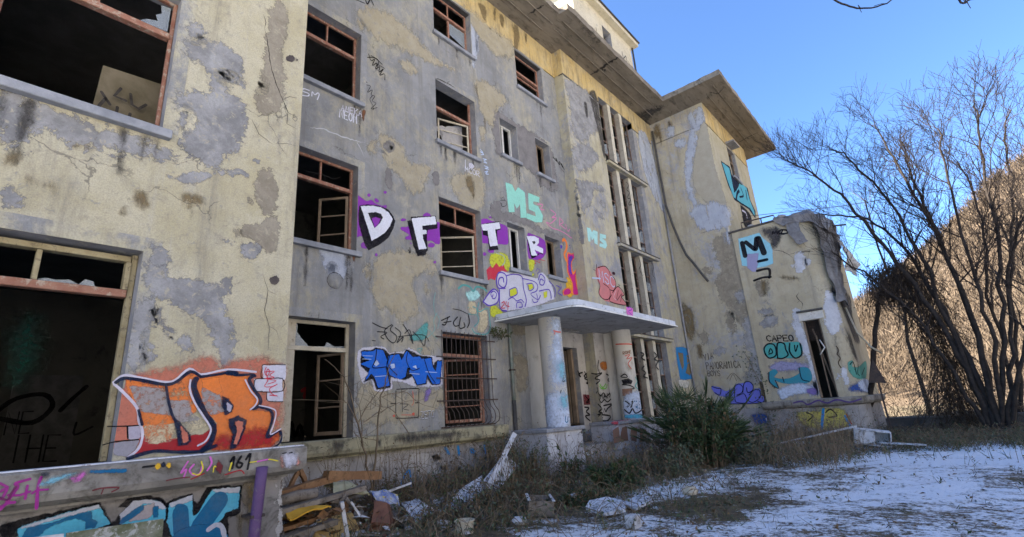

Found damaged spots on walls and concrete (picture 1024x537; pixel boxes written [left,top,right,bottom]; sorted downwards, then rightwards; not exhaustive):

damp [7,99,36,161]
peeling [0,0,298,260]
crack [254,14,363,153]
peeling [127,242,240,373]